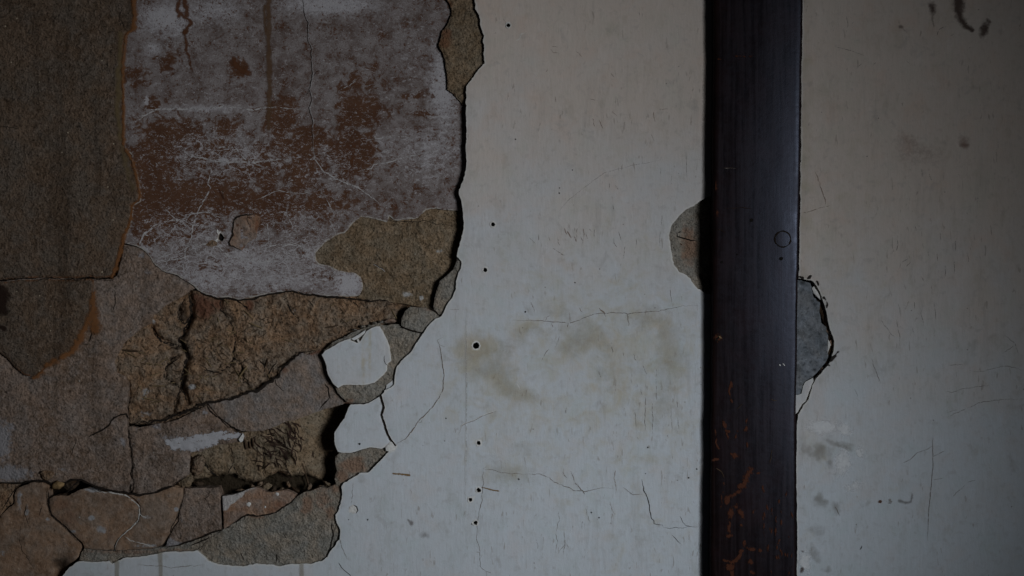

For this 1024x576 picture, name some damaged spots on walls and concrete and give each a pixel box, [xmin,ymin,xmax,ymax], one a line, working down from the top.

rust [263,0,272,130]
crack [0,3,459,568]
peeling [115,0,485,424]
spalling [669,196,710,294]
spalling [165,403,351,495]
crack [476,468,691,576]